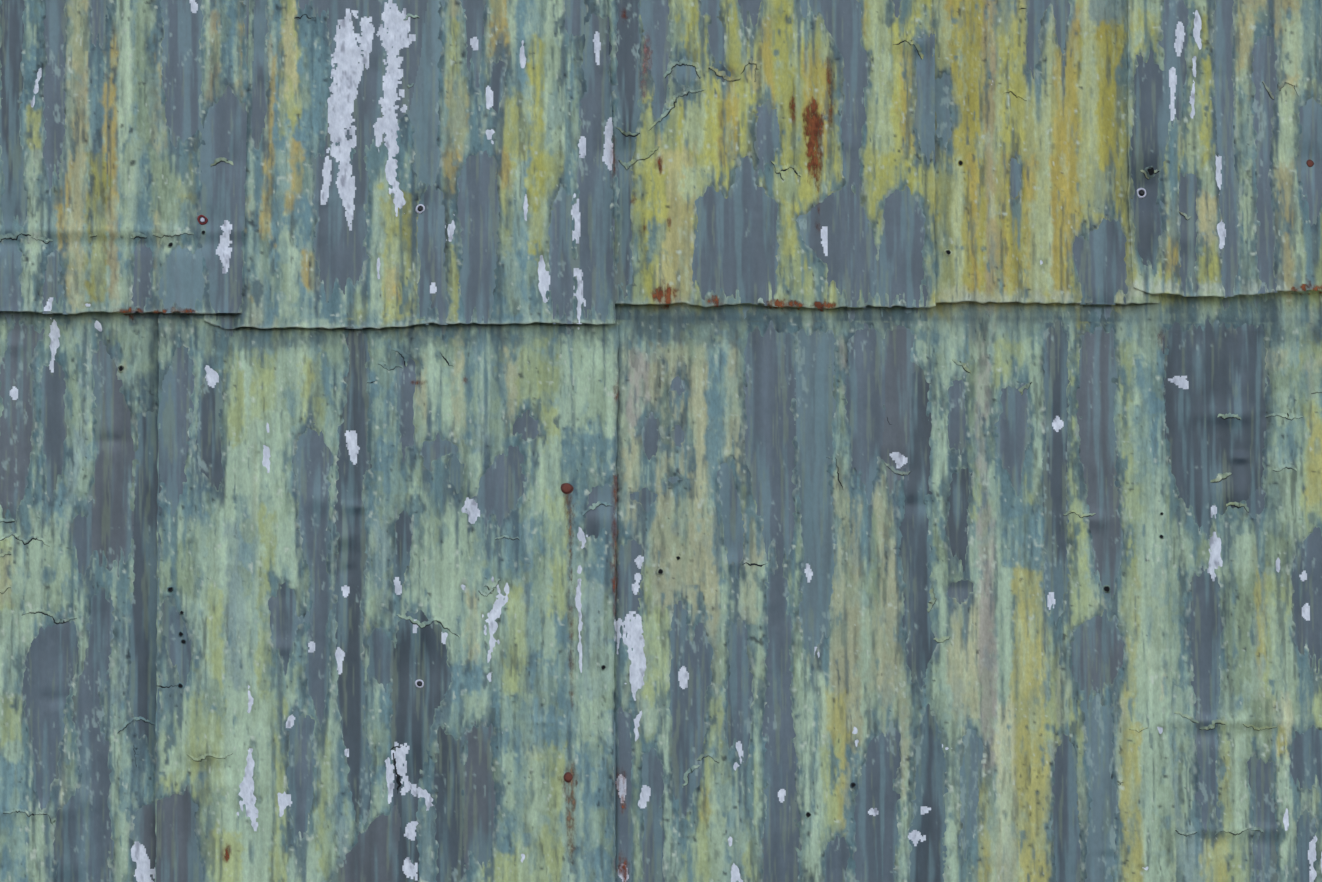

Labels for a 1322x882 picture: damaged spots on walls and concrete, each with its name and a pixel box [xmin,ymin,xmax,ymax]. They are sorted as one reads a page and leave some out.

peeling [538,0,696,335]
corrosion [789,72,832,191]
peeling [0,0,67,520]
corrosion [652,286,677,308]
corrosion [767,299,836,311]
peeling [577,0,984,882]
peeling [22,303,225,882]
peeling [268,324,503,882]
peeling [482,576,509,682]
peeling [575,565,583,673]
peeling [237,748,258,831]